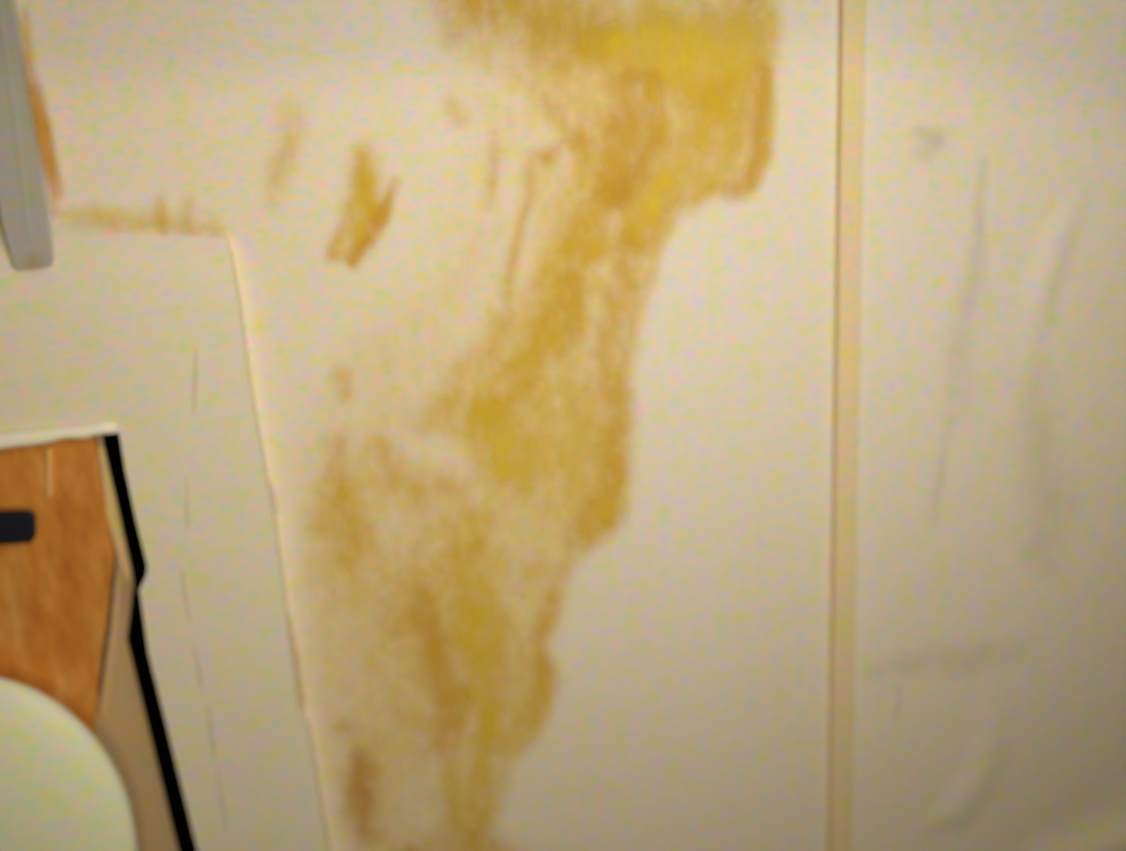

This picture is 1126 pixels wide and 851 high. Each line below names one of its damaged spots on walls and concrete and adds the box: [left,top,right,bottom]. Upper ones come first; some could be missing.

leakage [349,176,390,261]
leakage [603,112,676,247]
leakage [572,15,755,147]
leakage [749,81,769,188]